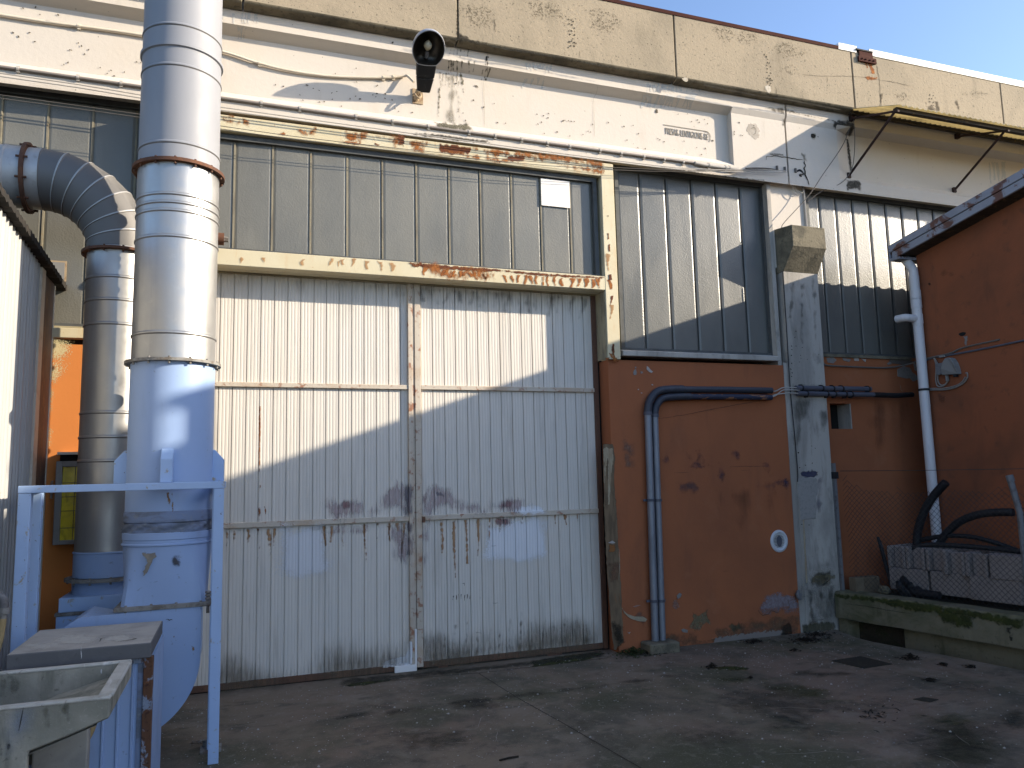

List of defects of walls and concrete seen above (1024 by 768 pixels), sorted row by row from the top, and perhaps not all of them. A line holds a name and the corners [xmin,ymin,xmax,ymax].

rust [345,132,604,174]
rust [329,258,395,271]
rust [410,233,614,319]
rust [226,528,276,547]
rust [440,519,500,577]
flaking render [603,444,640,650]
peeling [759,591,799,616]